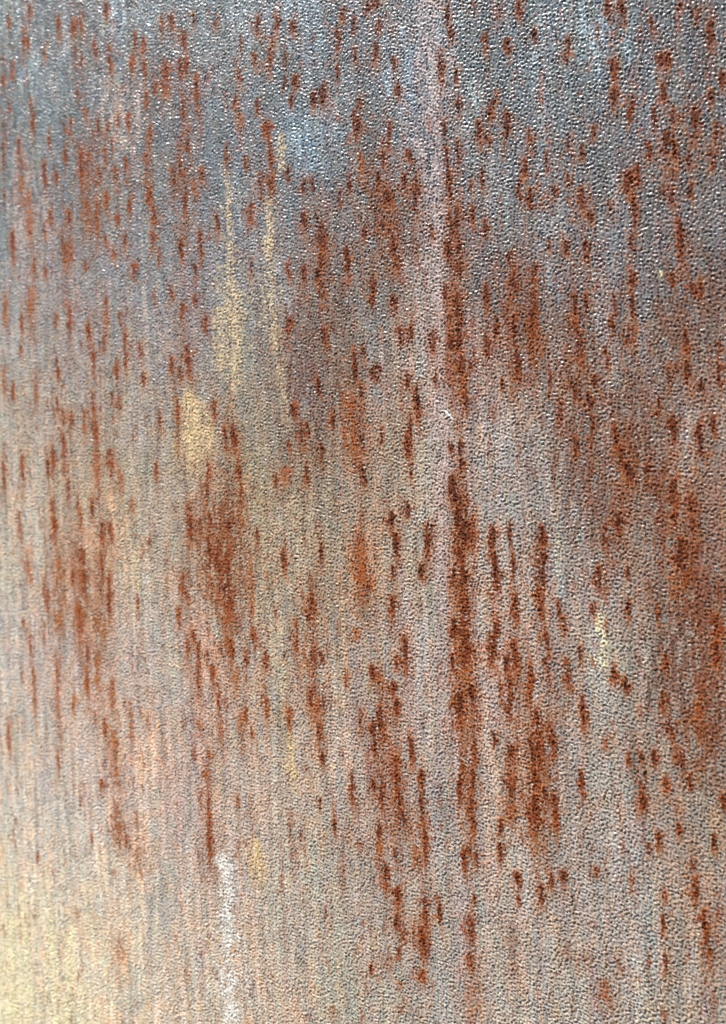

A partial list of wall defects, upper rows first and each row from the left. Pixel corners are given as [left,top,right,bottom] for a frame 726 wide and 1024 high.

rust [1,4,161,273]
rust [129,12,204,216]
rust [232,15,315,223]
rust [427,119,540,415]
rust [547,270,638,455]
rust [622,50,726,252]
rust [21,479,133,791]
rust [184,399,287,691]
rust [357,636,409,757]
rust [370,734,442,984]
rust [447,439,590,875]
rust [625,689,694,813]